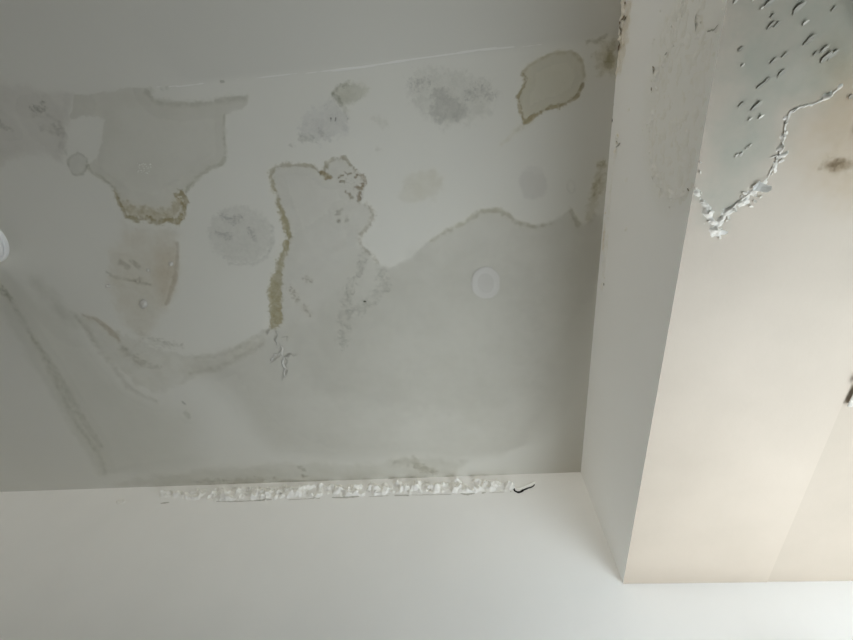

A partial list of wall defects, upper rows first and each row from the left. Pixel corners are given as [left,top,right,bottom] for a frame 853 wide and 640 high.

peeling [694,84,843,239]
peeling [159,478,515,504]